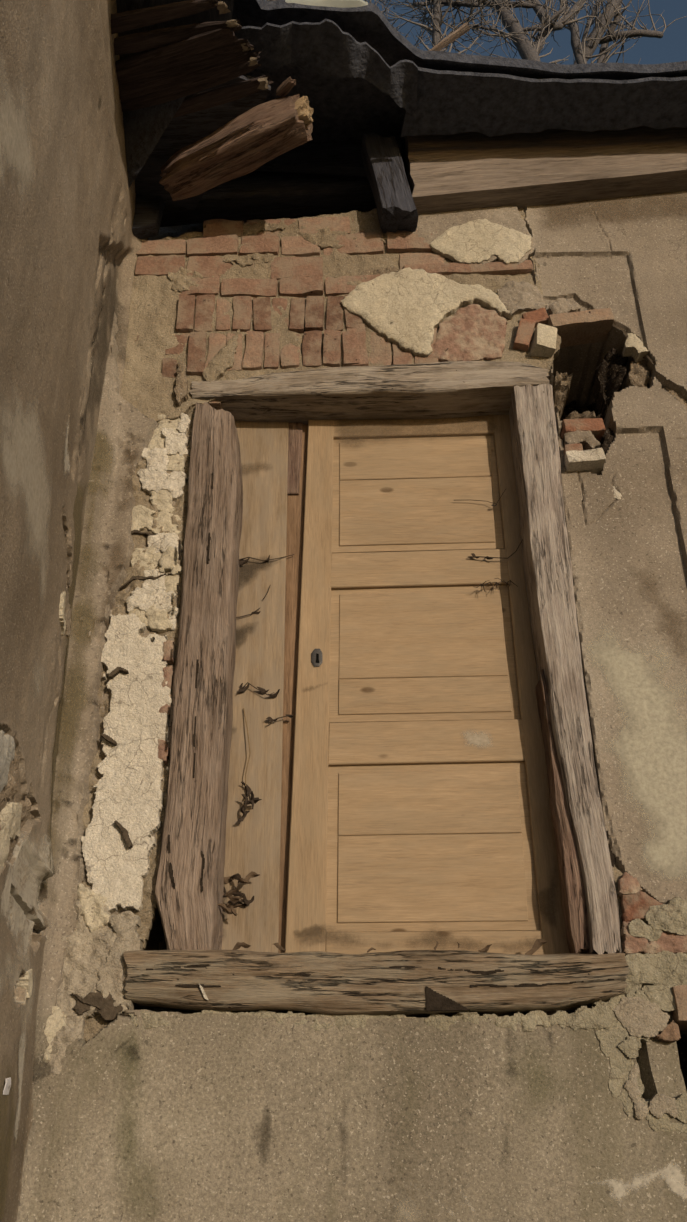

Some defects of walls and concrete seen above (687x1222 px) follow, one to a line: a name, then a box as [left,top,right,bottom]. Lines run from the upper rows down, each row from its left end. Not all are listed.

peeling [0,727,54,998]
water stain [19,433,111,888]
flaking render [43,206,687,1077]
spalling [193,867,687,1136]